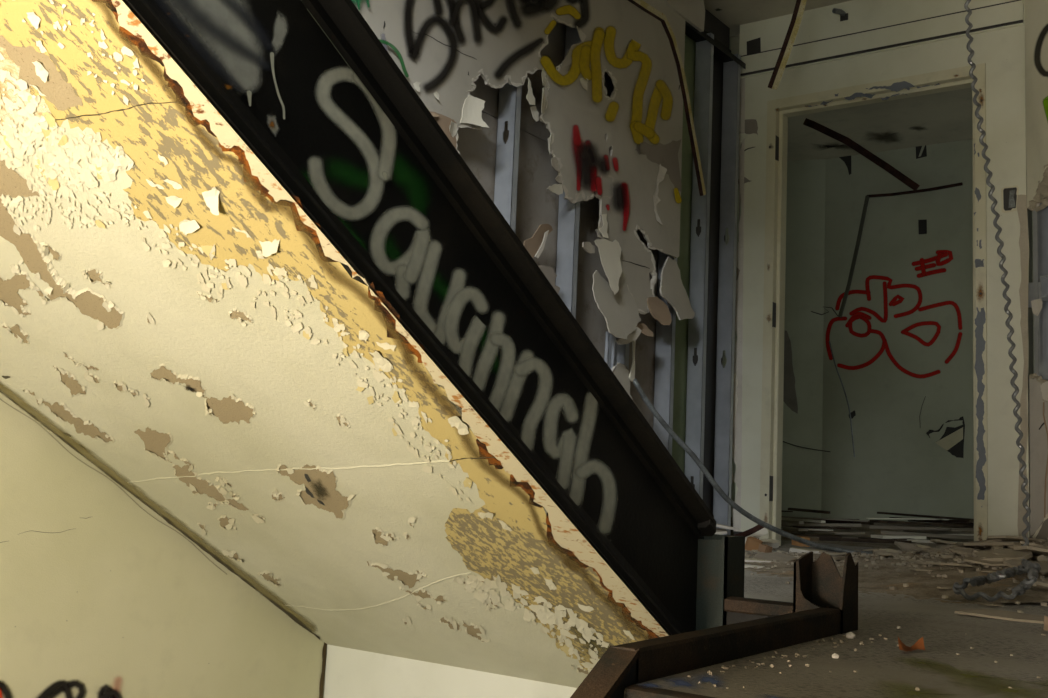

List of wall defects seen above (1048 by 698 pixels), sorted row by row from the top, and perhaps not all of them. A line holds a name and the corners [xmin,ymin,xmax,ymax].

peeling [0,0,649,675]
spalling [620,225,663,313]
peeling [635,140,682,224]
peeling [1016,164,1048,540]